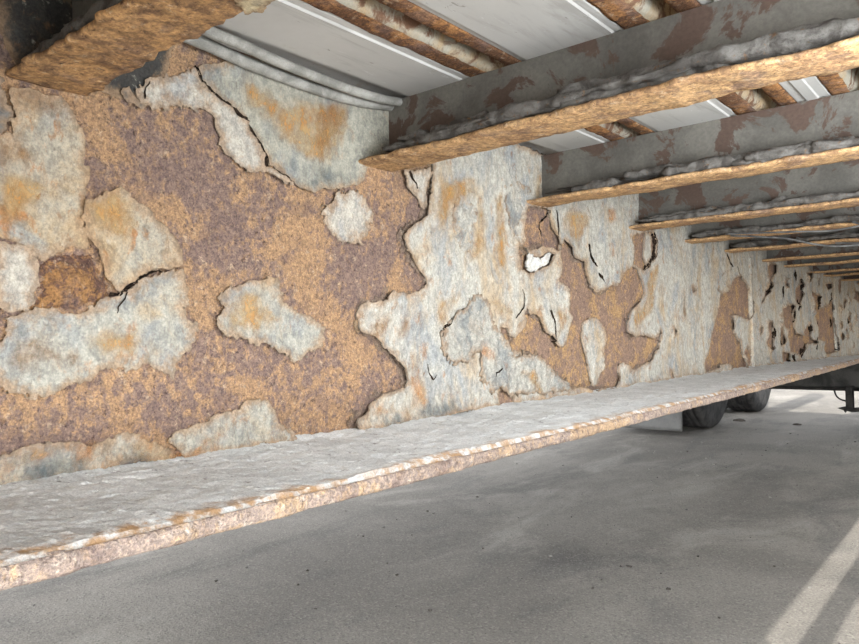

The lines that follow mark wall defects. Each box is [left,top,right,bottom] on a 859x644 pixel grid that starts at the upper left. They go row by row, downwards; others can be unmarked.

peeling [94,44,390,246]
crack [194,65,294,182]
rust [382,16,859,152]
rust [545,136,859,194]
peeling [0,76,199,401]
crack [109,268,162,313]
rust [0,34,428,457]
peeling [216,276,326,363]
crack [588,244,606,284]
peeling [346,144,859,430]
rust [501,191,859,388]
peeling [0,398,297,485]